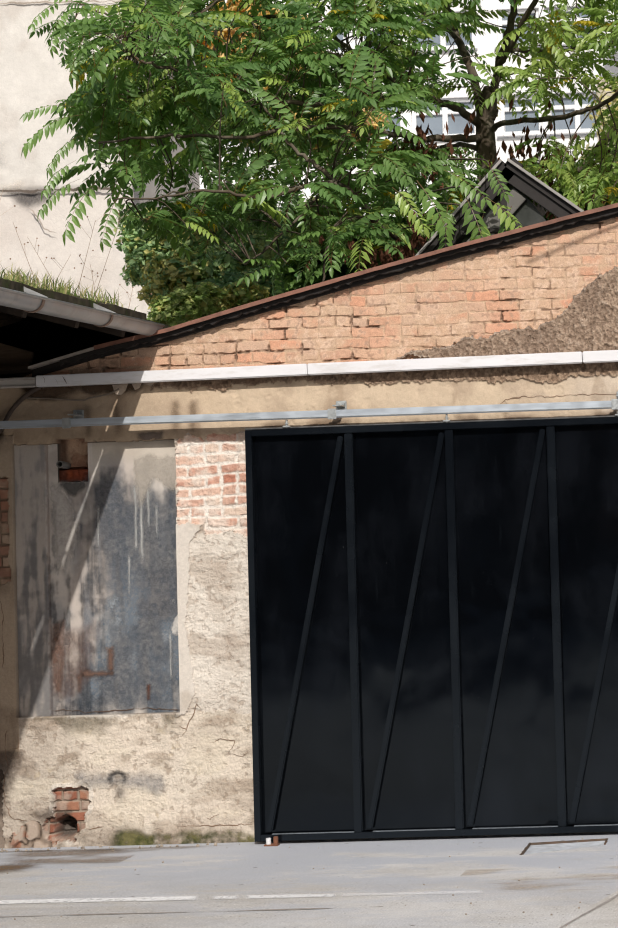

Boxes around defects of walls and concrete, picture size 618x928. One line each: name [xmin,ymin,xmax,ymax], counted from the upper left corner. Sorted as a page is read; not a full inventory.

flaking render [45,217,618,375]
flaking render [0,476,11,585]
flaking render [175,431,247,537]
leakage [49,456,180,715]
spalling [10,785,91,848]